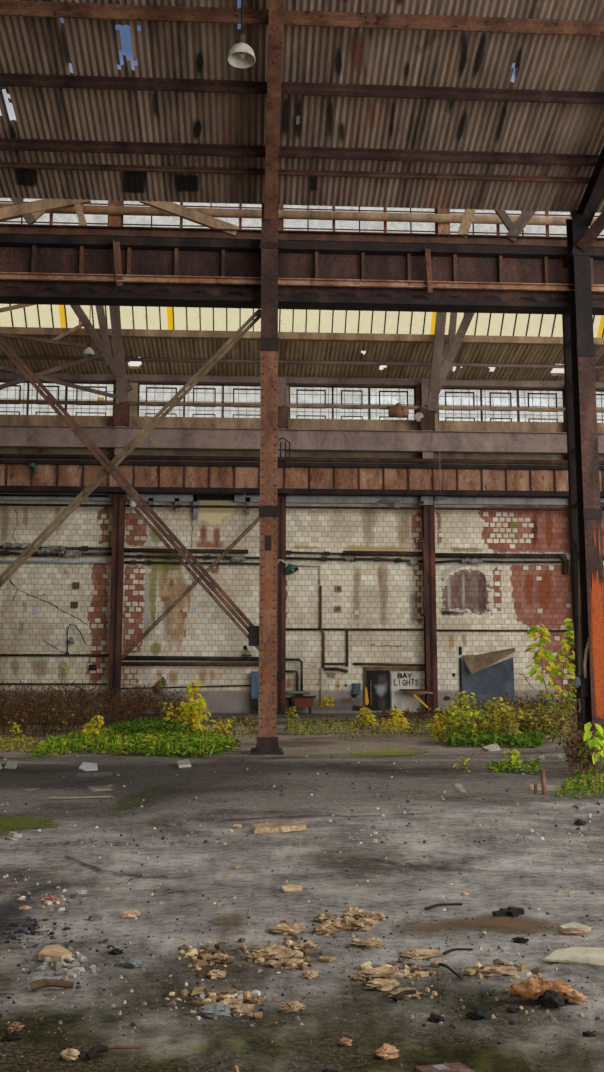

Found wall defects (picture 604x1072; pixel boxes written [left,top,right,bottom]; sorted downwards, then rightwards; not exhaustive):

peeling [97,507,110,544]
peeling [124,509,148,546]
crack [9,579,87,625]
peeling [85,563,109,683]
peeling [121,668,140,686]
peeling [122,565,146,653]
leakage [144,570,168,654]
peeling [441,505,575,693]
rust [591,570,604,718]